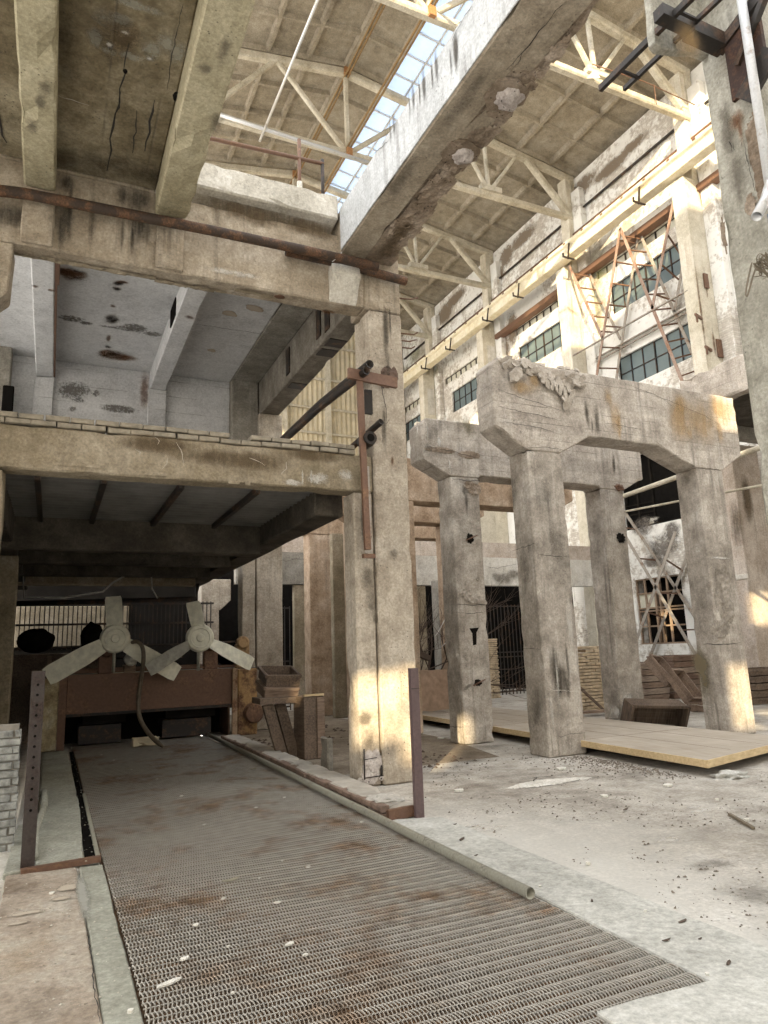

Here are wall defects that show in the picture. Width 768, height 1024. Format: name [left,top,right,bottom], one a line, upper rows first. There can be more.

crack [106,6,183,171]
spalling [385,33,573,243]
peeling [500,225,535,280]
peeling [498,313,586,411]